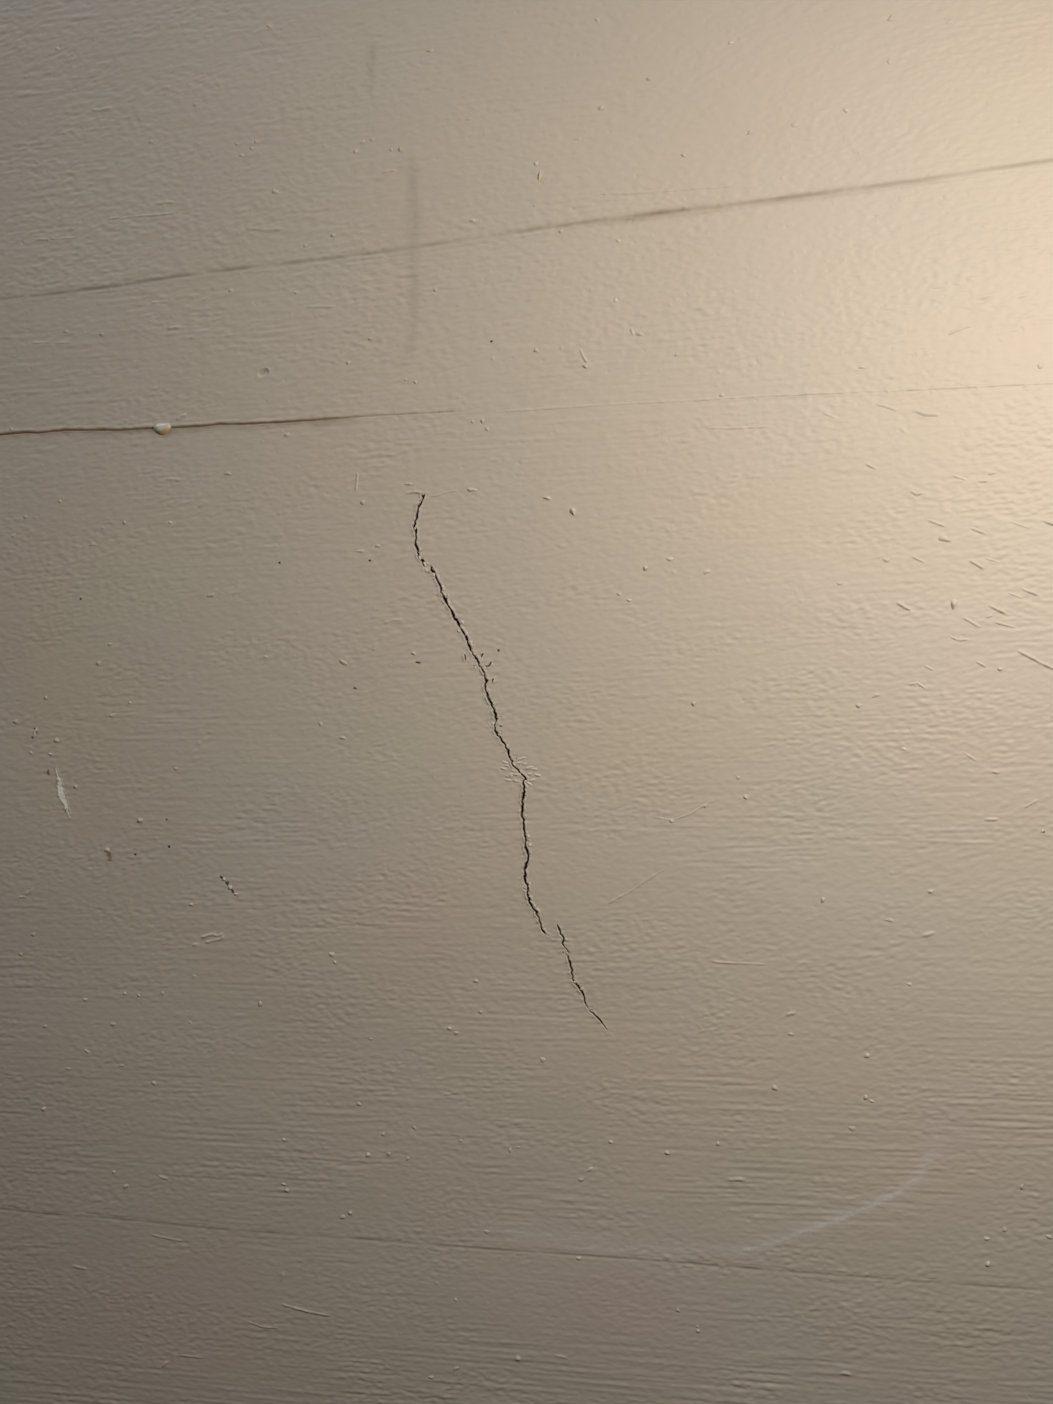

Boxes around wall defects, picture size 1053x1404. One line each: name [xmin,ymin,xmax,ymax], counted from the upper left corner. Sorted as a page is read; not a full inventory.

crack [408,489,615,1040]